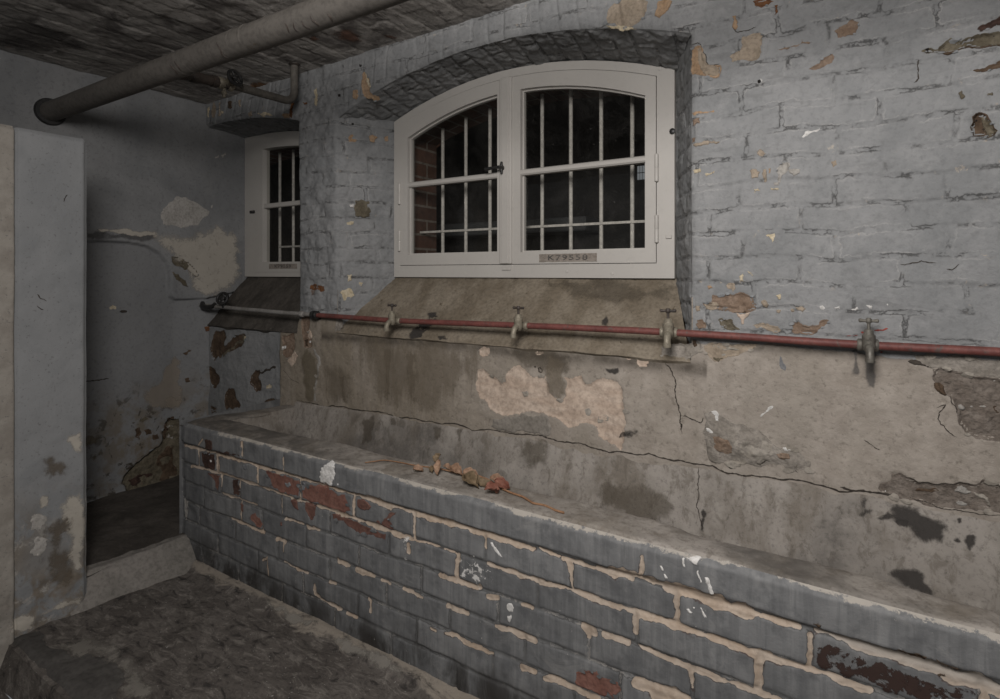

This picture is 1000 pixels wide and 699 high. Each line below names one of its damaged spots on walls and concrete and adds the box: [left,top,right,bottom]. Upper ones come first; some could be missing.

spalling [922,17,1000,55]
spalling [970,112,998,138]
peeling [660,271,872,362]
spalling [476,347,630,450]
crack [665,363,703,432]
spalling [908,353,1000,441]
peeling [265,471,396,539]
crack [302,396,995,527]
damp [861,500,946,541]
spalling [878,473,1000,515]
damp [891,569,932,595]
peeling [817,644,976,699]